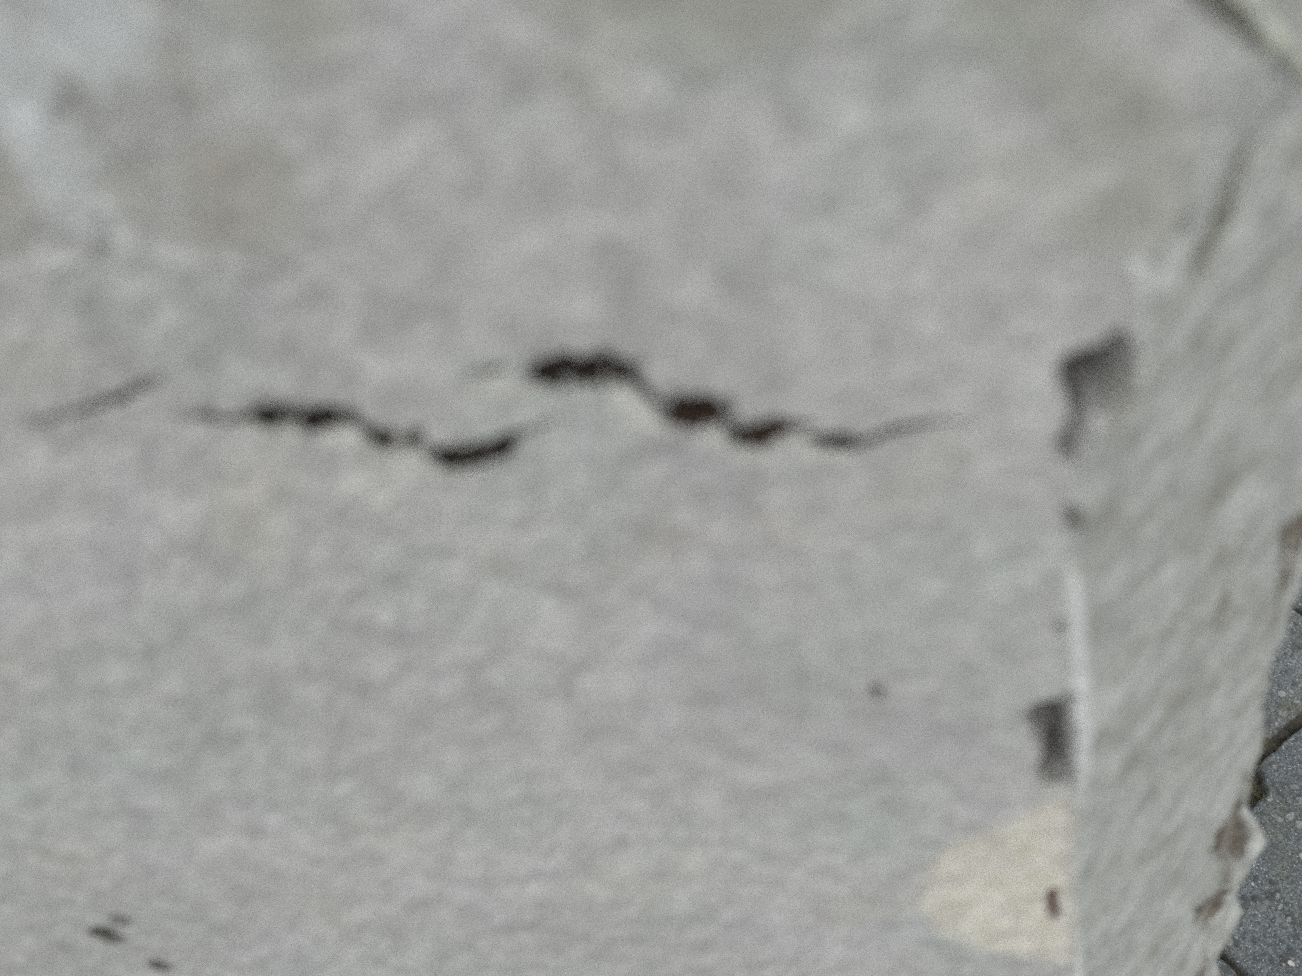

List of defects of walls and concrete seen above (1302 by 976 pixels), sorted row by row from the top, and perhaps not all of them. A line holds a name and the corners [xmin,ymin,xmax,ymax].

crack [32,377,158,427]
crack [180,344,975,482]
spalling [1049,326,1140,467]
peeling [1059,505,1088,537]
peeling [911,695,1085,967]